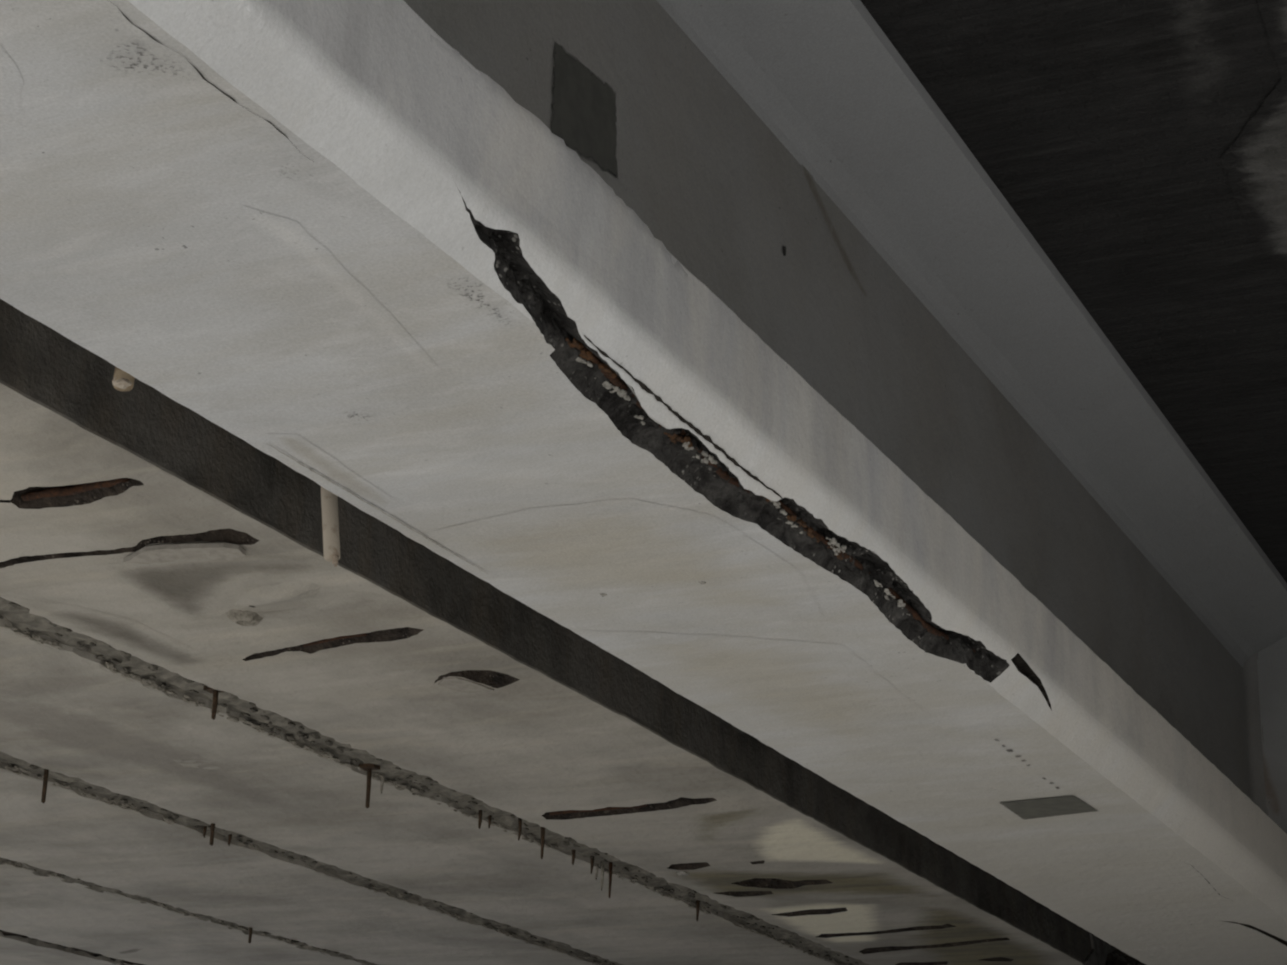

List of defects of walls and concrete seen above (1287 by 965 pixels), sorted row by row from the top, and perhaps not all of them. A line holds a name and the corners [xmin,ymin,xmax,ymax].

spalling [458,189,1010,683]
spalling [9,478,144,509]
spalling [0,528,260,568]
spalling [242,627,423,661]
spalling [435,670,520,693]
spalling [541,797,717,820]
spalling [668,862,710,876]
spalling [715,860,832,897]
spalling [772,908,848,917]
crack [1186,863,1287,946]
spalling [816,924,1014,965]